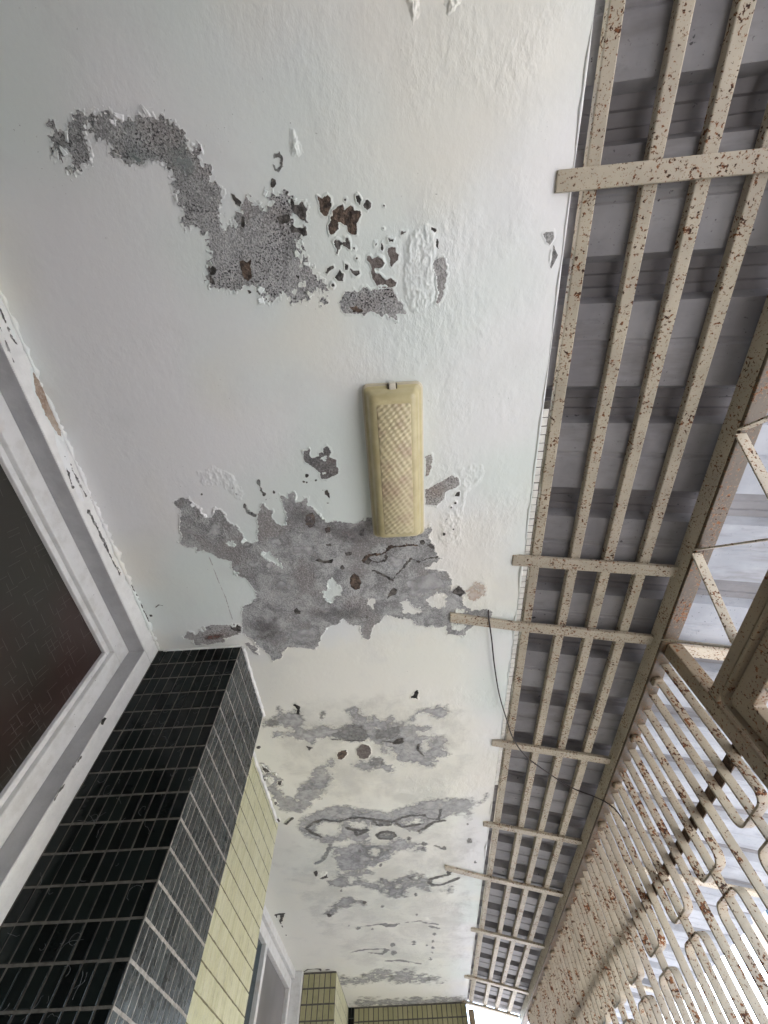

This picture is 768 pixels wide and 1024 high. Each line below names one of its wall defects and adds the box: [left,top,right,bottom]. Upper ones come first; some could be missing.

flaking render [43,104,410,324]
flaking render [0,291,163,650]
flaking render [173,443,494,663]
damp [263,704,449,772]
damp [299,793,488,917]